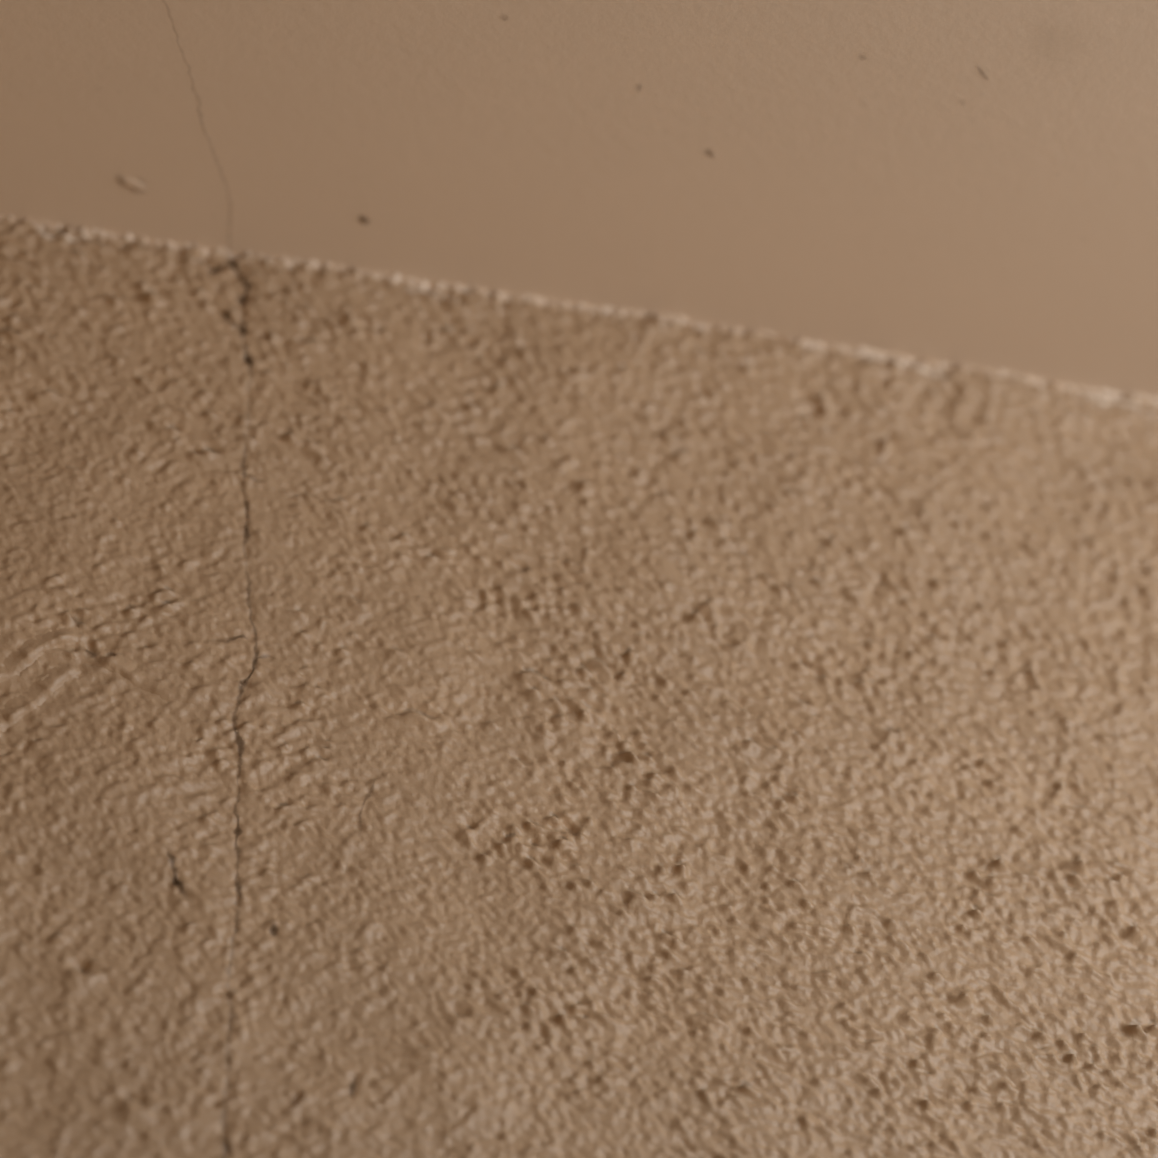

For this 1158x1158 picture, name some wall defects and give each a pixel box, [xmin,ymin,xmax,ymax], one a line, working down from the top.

crack [211,259,252,367]